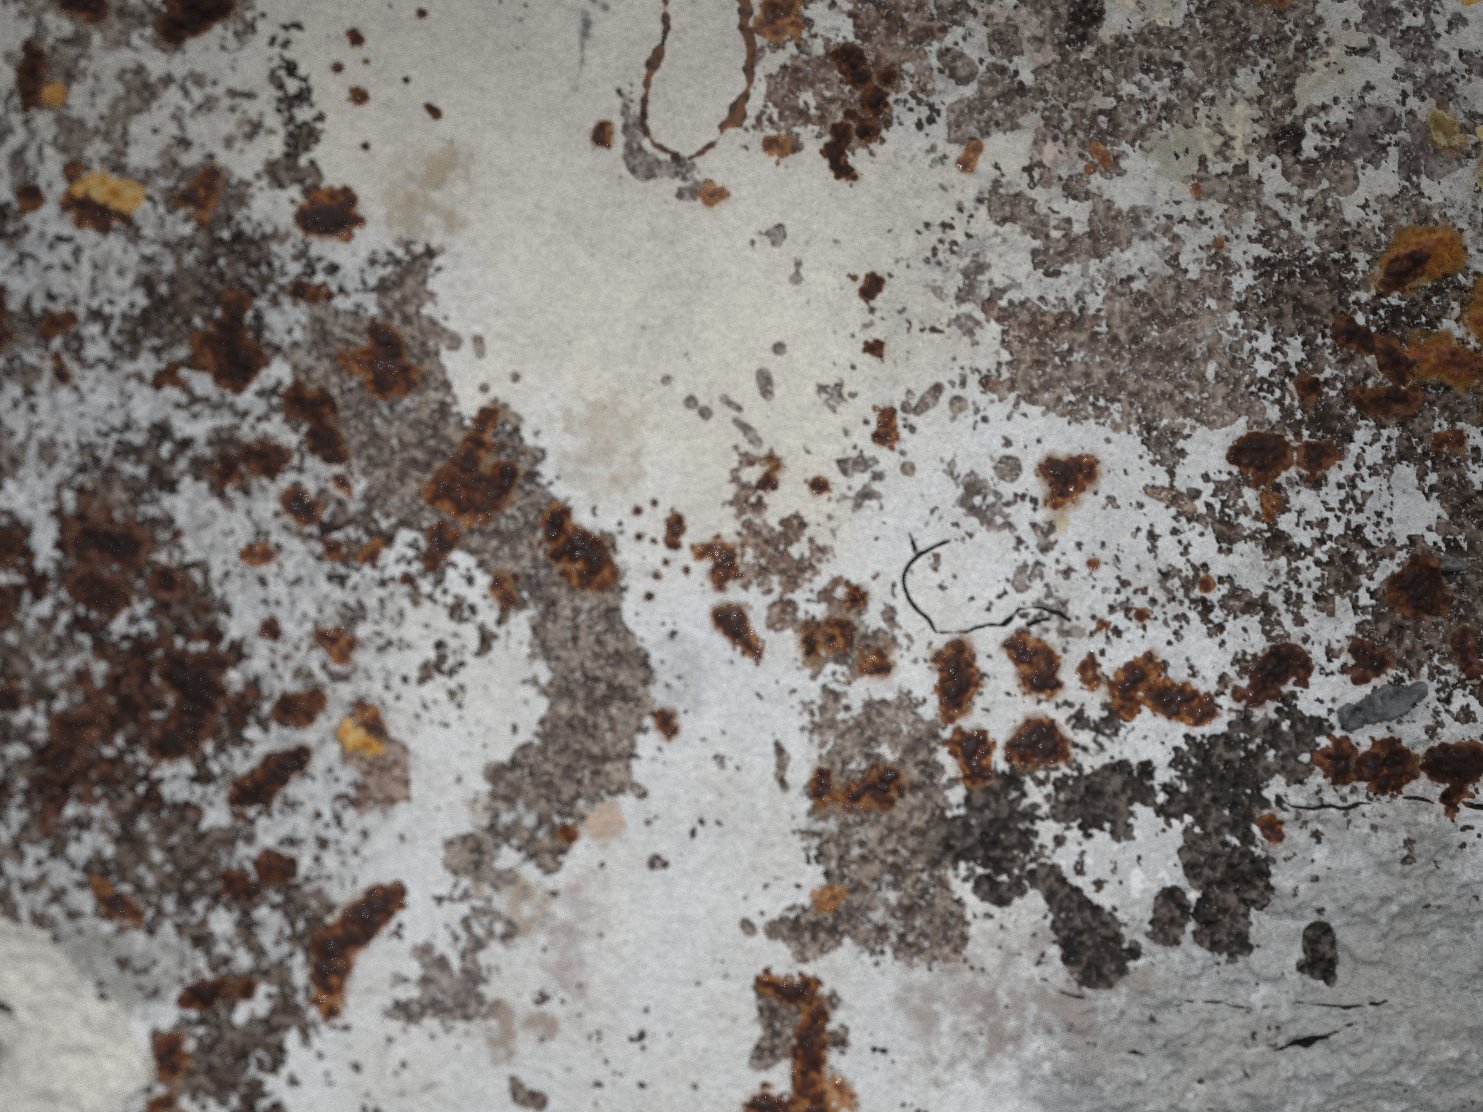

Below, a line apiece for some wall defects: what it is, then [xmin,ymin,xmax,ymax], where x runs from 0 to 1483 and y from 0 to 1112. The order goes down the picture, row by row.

rust [152,287,268,395]
rust [205,376,384,566]
rust [1037,454,1099,510]
rust [1226,432,1342,522]
rust [633,499,765,667]
crack [902,533,1071,634]
rust [147,646,230,766]
rust [224,686,389,820]
rust [931,619,1314,787]
rust [1308,732,1483,823]
rust [307,880,408,1026]
rust [743,966,857,1112]